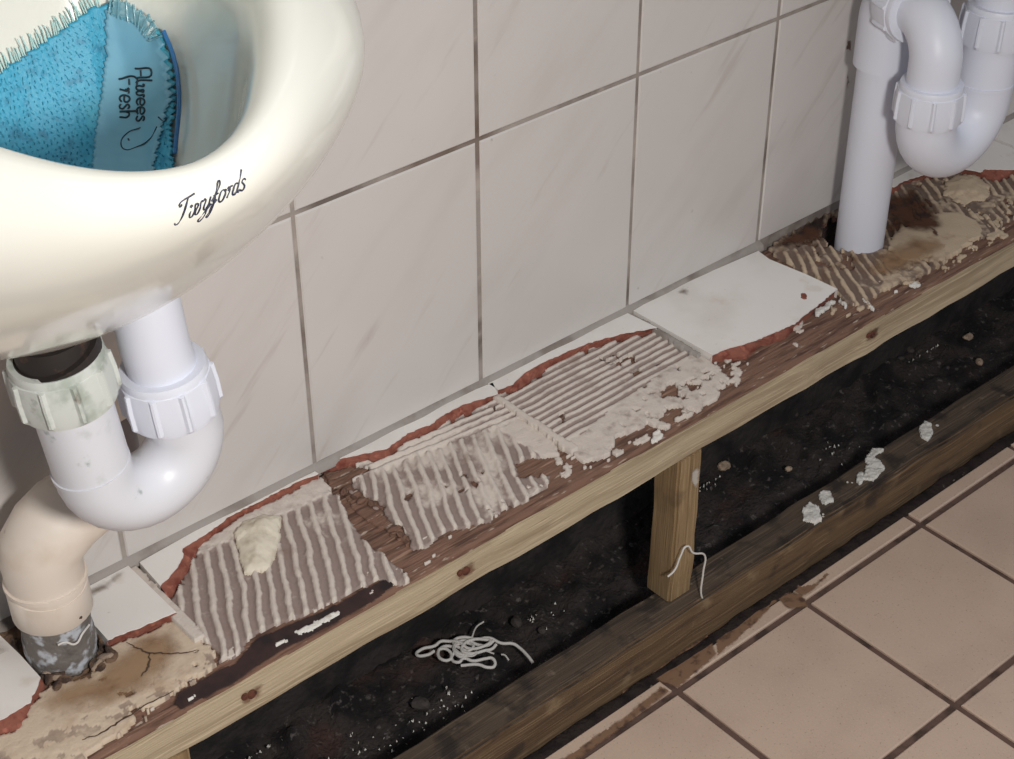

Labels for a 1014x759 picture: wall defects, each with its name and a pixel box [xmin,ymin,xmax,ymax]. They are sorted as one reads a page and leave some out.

spalling [891,169,933,193]
spalling [960,119,1014,182]
spalling [821,218,837,248]
water stain [879,190,939,274]
peeling [941,198,1013,273]
spalling [699,267,1014,477]
spalling [89,251,874,672]
spalling [189,476,655,759]
spalling [0,636,73,735]
water stain [58,639,172,702]
crack [82,690,174,740]
crack [126,642,199,676]